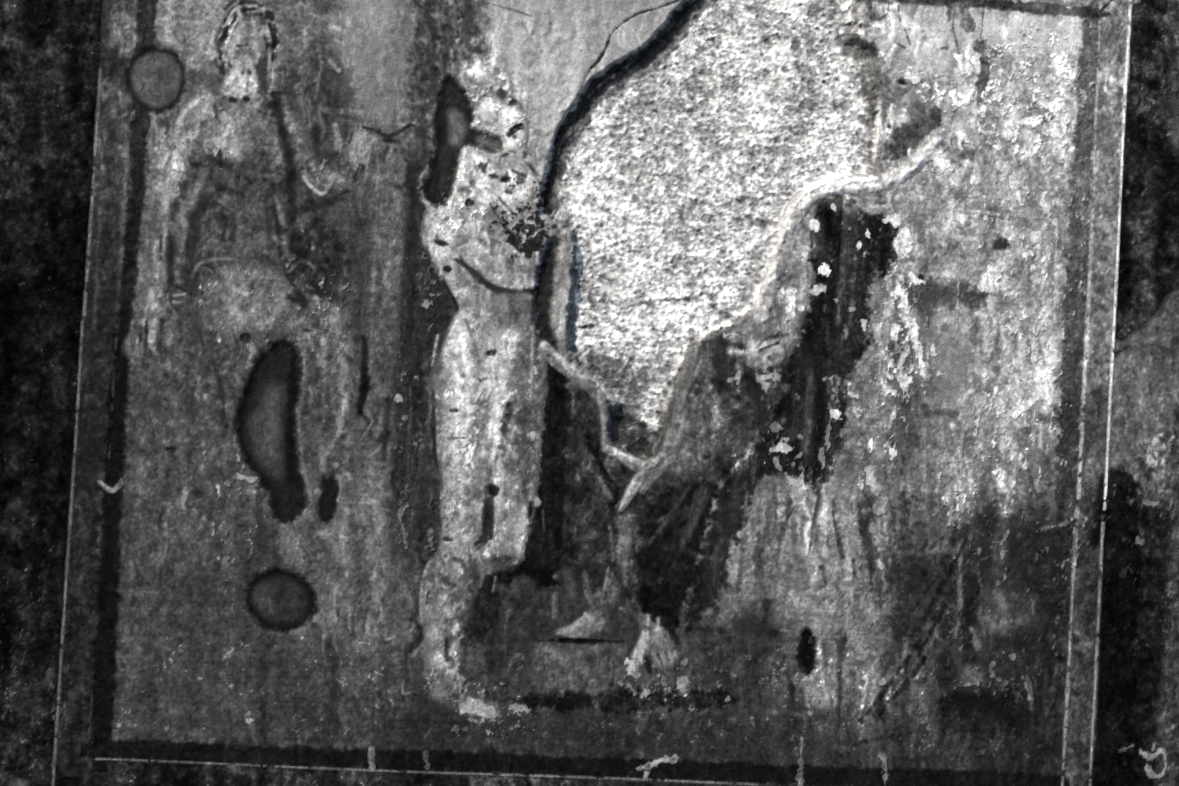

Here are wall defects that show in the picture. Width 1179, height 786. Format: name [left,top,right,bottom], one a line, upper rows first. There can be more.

leakage [406,0,488,185]
crack [587,0,679,75]
flaking render [410,0,1097,542]
peeling [394,352,430,454]
peeling [424,490,541,564]
peeling [796,190,1179,722]